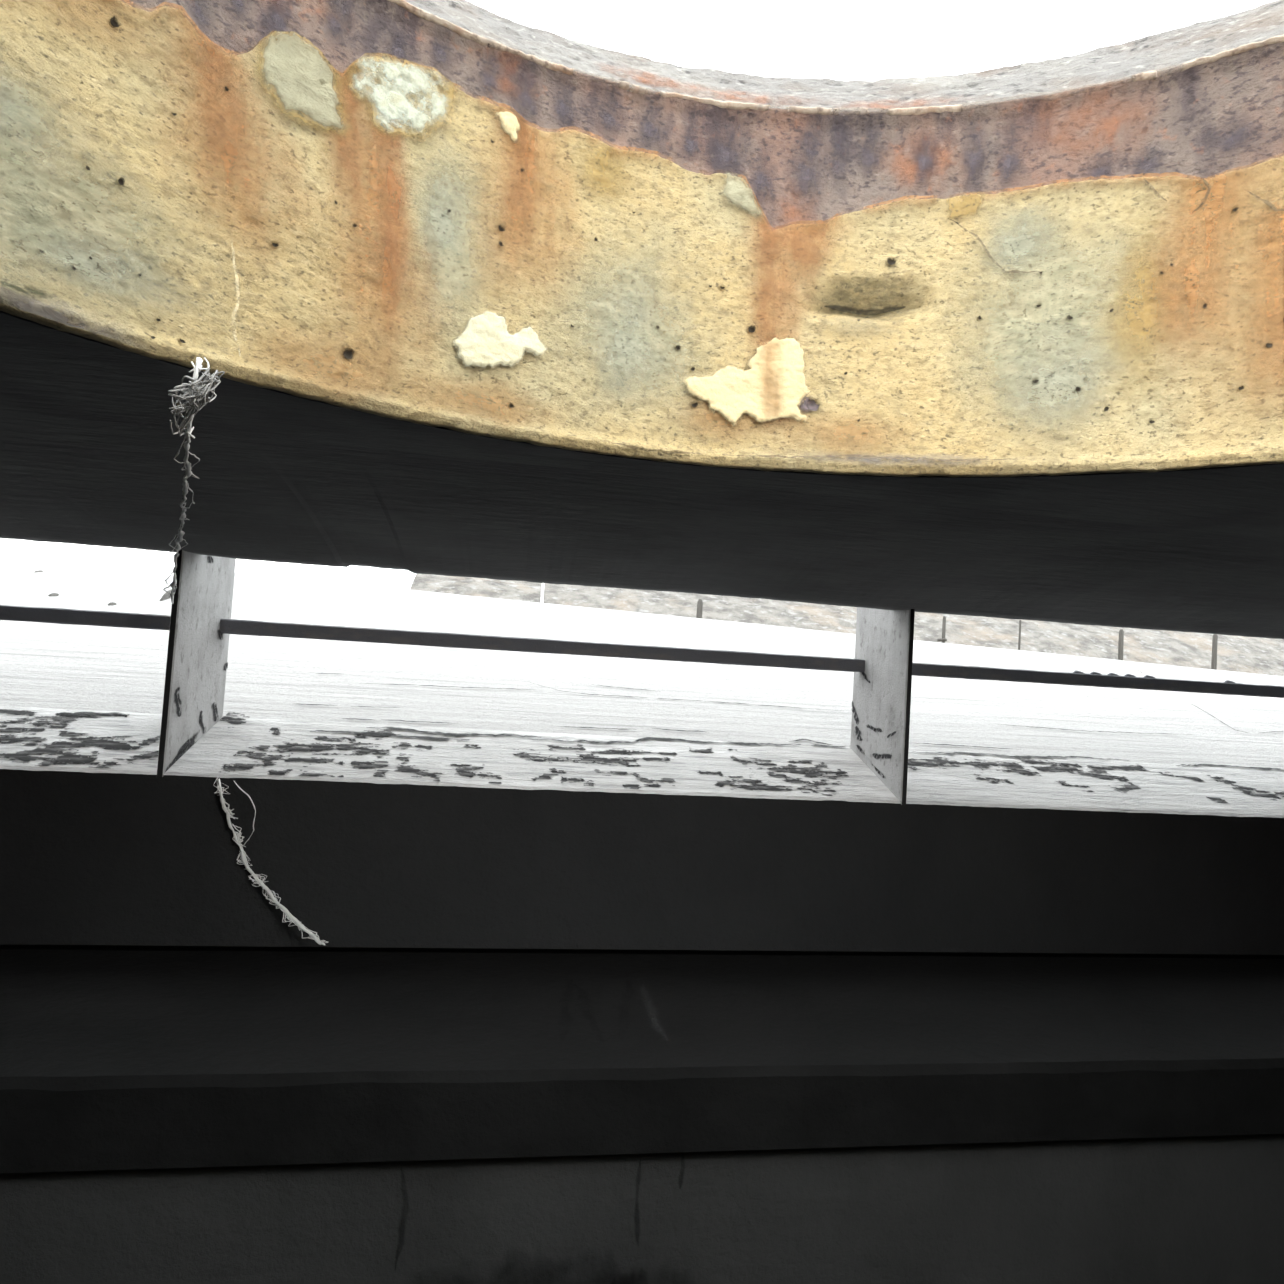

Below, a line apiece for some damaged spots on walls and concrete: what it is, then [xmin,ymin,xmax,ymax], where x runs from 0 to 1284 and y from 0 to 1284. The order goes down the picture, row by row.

peeling [261,31,454,136]
peeling [454,311,547,367]
peeling [684,326,820,425]